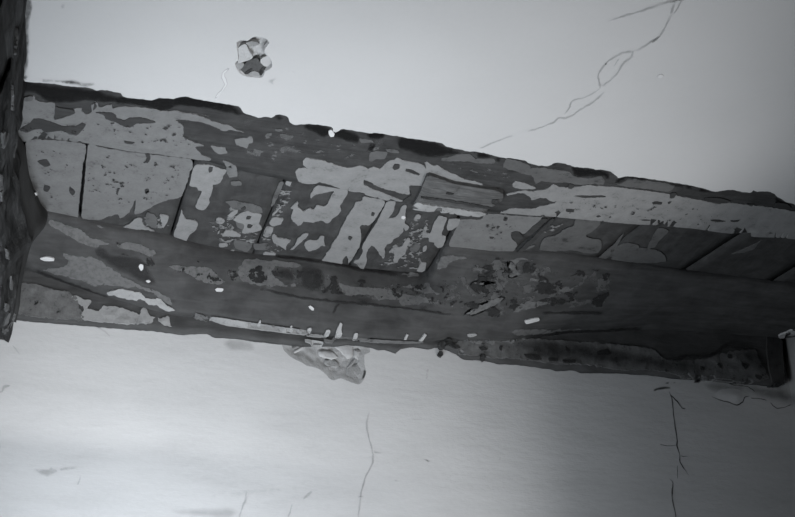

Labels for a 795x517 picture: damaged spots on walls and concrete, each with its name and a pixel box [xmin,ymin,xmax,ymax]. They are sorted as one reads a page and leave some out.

peeling [18,0,795,318]
flaking render [282,345,370,384]
spalling [437,337,461,358]
crack [654,387,686,517]